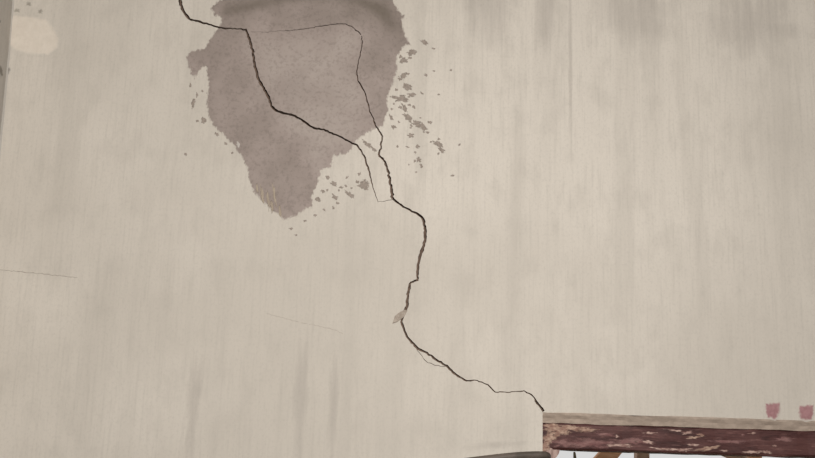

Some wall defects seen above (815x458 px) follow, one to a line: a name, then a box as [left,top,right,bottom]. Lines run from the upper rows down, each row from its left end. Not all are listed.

crack [178,0,545,412]
peeling [543,423,791,454]